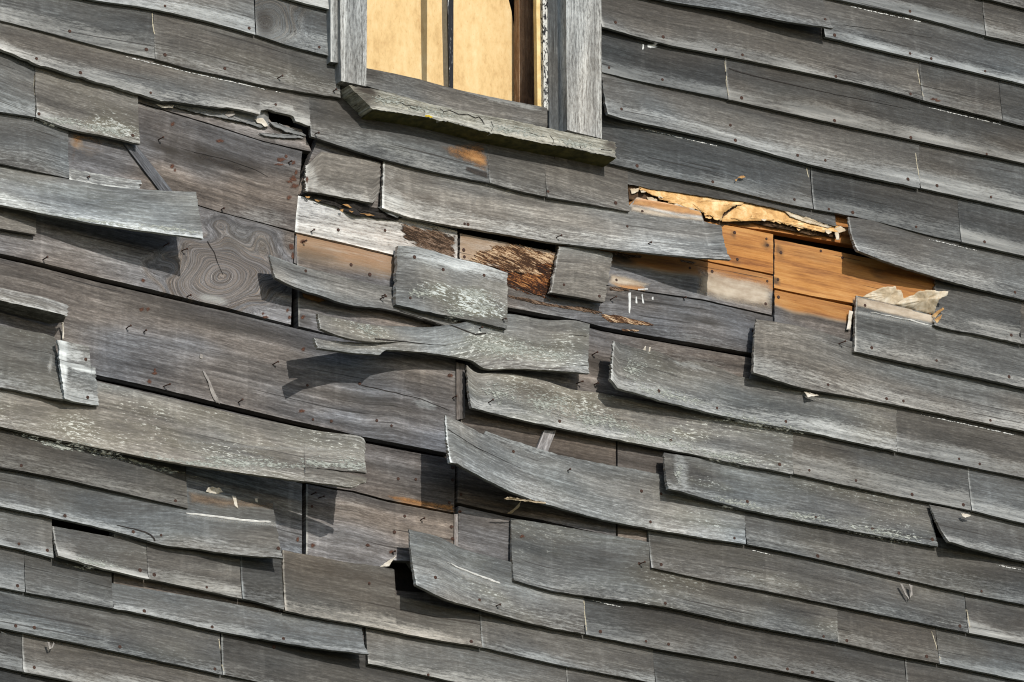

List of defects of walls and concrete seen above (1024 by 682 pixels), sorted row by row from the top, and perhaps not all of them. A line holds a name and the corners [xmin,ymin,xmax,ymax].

peeling [629,200,703,220]